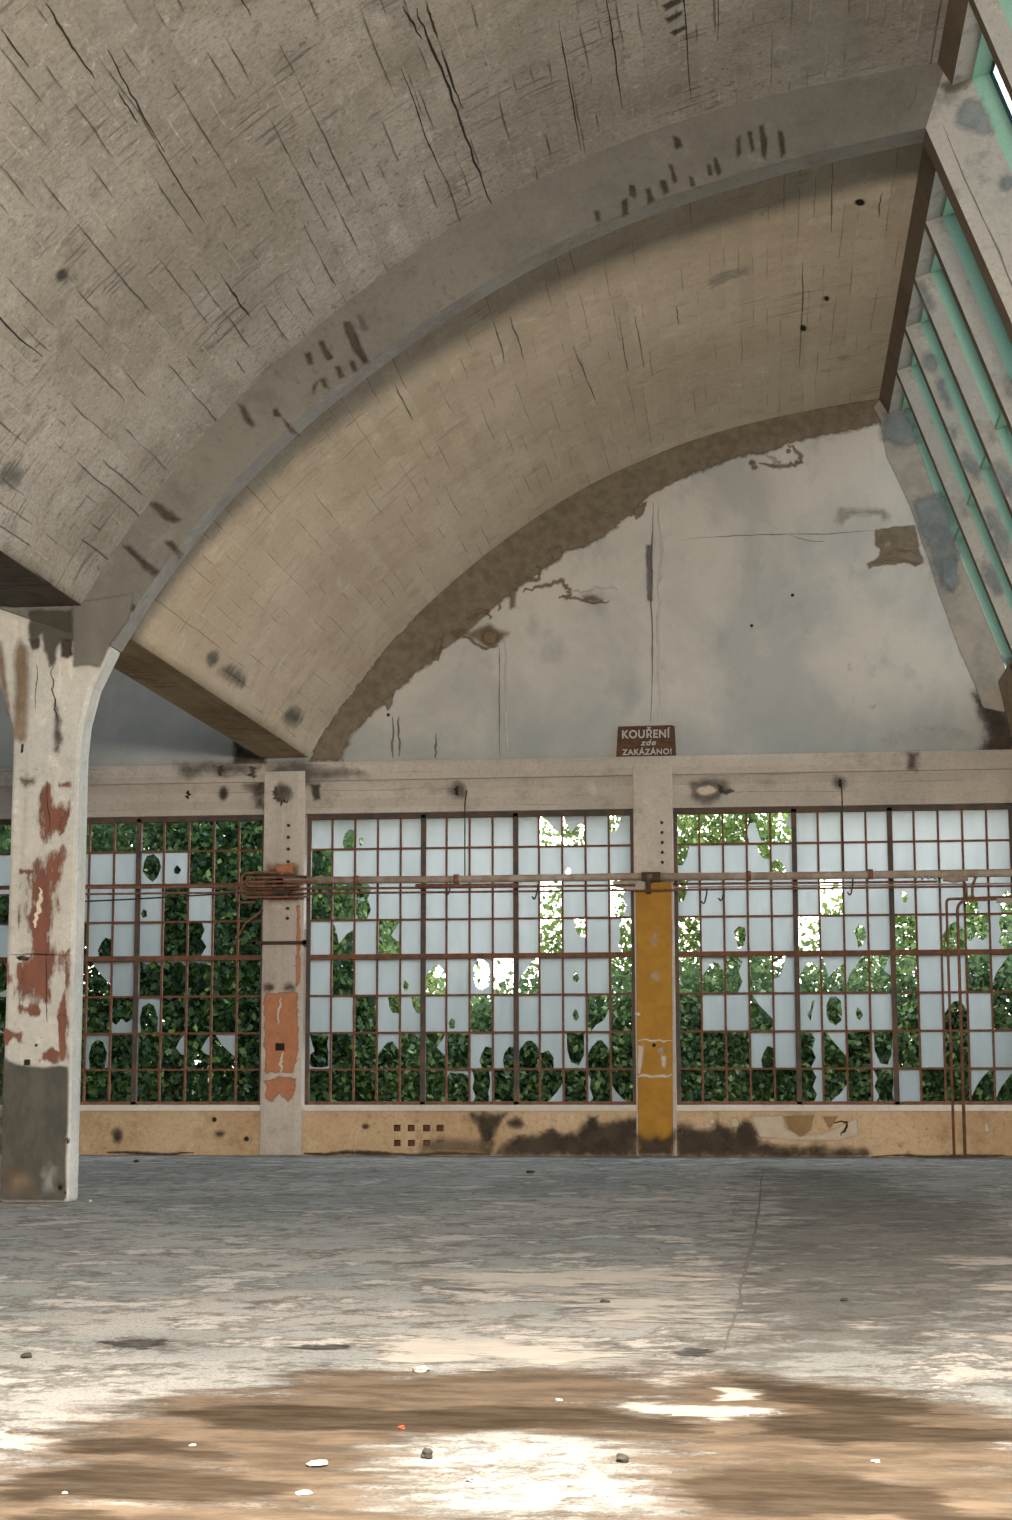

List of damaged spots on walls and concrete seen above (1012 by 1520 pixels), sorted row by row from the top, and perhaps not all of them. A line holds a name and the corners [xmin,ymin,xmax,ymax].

crack [1,29,29,67]
crack [46,3,204,221]
crack [401,5,492,204]
crack [606,0,623,110]
damp [942,79,991,133]
crack [0,317,42,356]
crack [225,281,250,316]
flaking render [311,399,1006,761]
damp [914,494,959,591]
peeling [4,779,71,1063]
peeling [263,992,299,1101]
damp [304,1113,1012,1157]